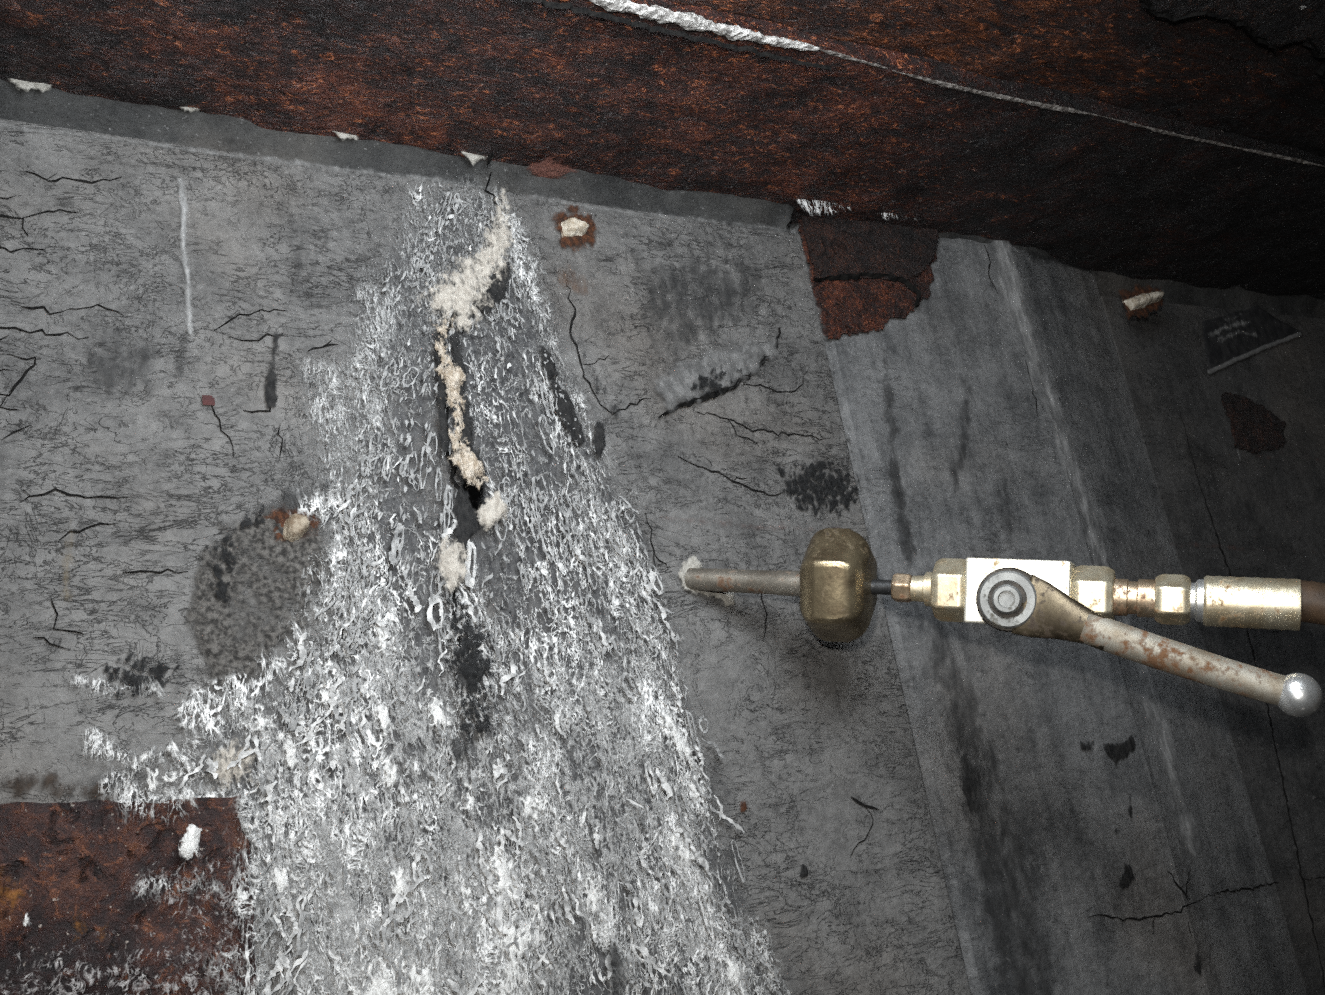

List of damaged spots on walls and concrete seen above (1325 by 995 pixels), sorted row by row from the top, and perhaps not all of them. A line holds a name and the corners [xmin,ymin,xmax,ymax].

crack [0,171,121,253]
crack [215,309,338,351]
rust [553,205,596,251]
spalling [797,199,939,339]
rust [1119,285,1163,319]
crack [0,304,124,439]
crack [211,405,283,459]
crack [430,153,540,747]
crack [20,488,125,540]
leakage [1,151,791,995]